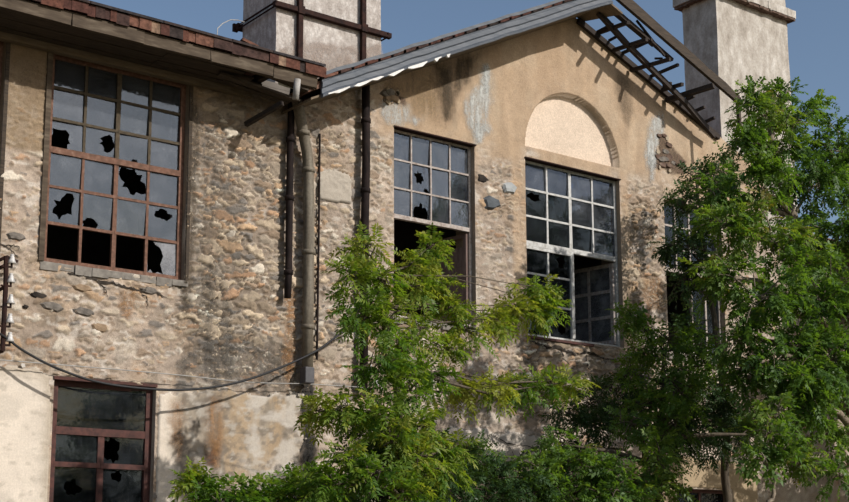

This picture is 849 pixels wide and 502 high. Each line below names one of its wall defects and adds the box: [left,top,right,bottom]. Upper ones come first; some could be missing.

leakage [382,103,417,123]
leakage [436,53,473,117]
leakage [465,65,490,142]
spalling [654,134,687,173]
crack [68,272,167,309]